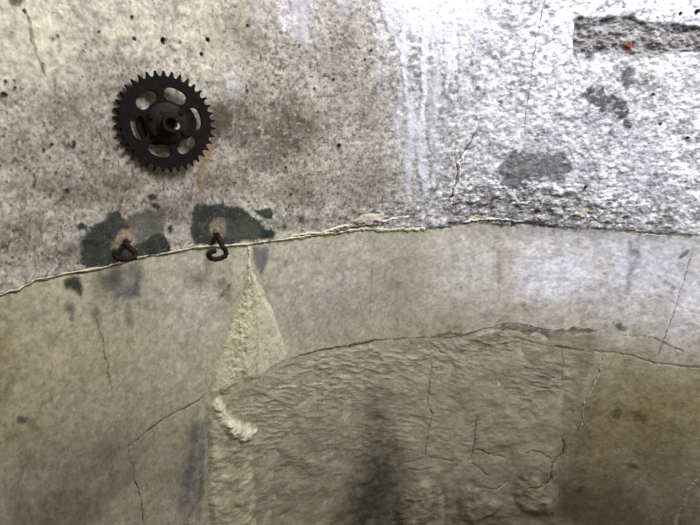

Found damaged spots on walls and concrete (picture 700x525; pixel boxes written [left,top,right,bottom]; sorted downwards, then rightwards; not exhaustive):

damp [380,0,488,196]
spalling [573,14,700,58]
rust [112,228,138,248]
crack [0,132,692,296]
crack [290,305,700,489]